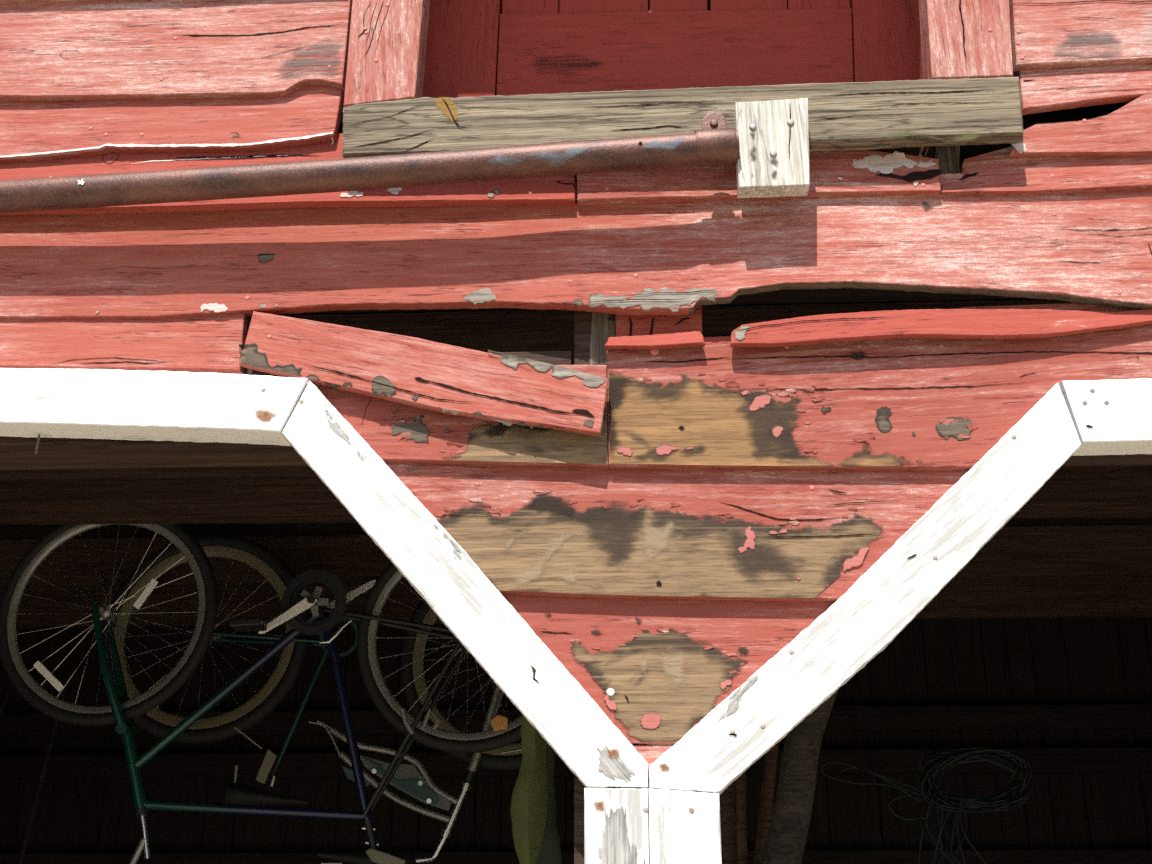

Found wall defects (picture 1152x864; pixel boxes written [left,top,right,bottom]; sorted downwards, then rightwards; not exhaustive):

crack [789,0,1152,159]
peeling [851,151,936,174]
crack [1062,227,1152,263]
peeling [239,343,352,389]
peeling [371,376,397,397]
peeling [391,350,922,466]
peeling [936,417,978,440]
peeling [422,489,883,598]
peeling [570,617,758,745]
peeling [593,807,637,864]